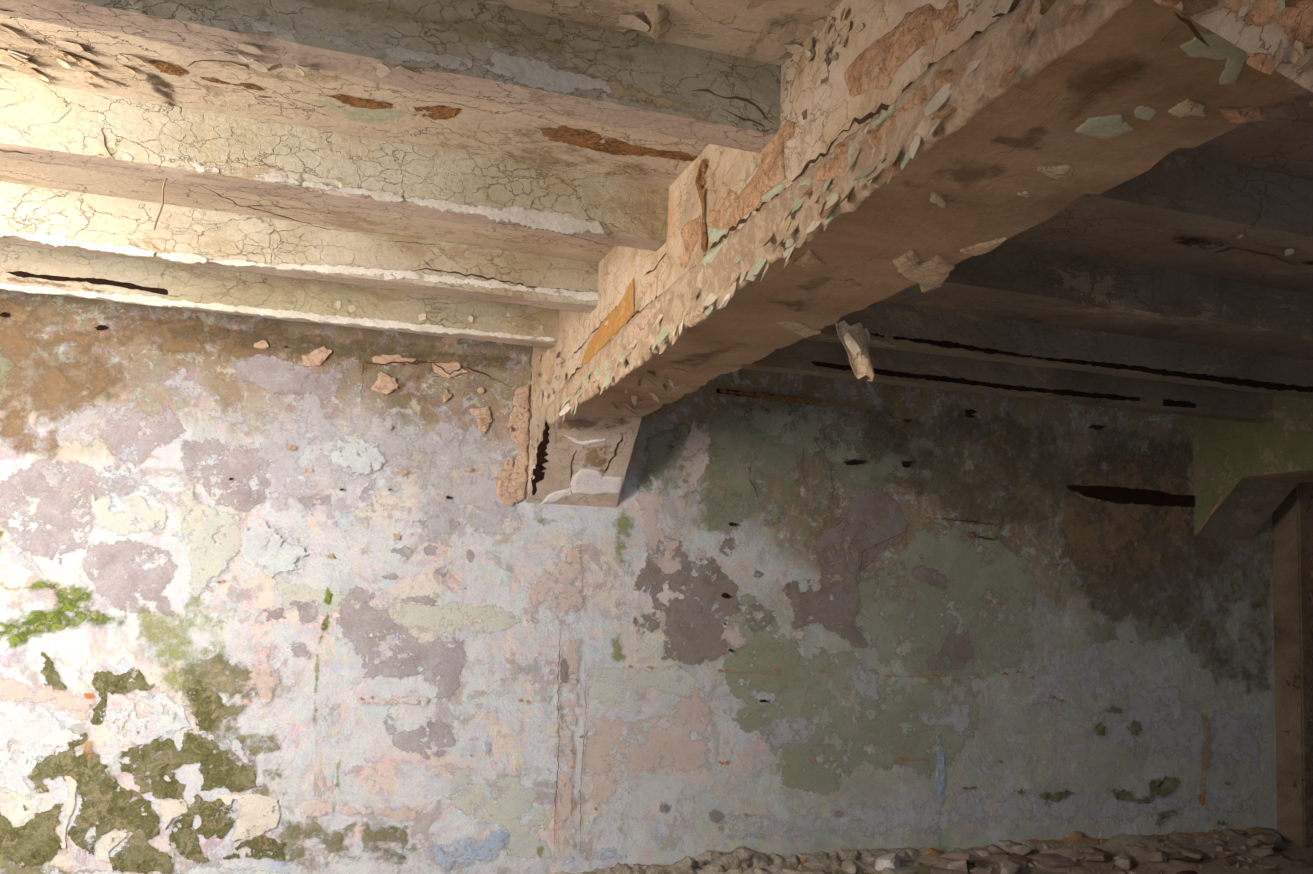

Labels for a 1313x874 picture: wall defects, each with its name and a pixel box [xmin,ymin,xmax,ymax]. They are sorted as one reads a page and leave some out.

crack [187,60,253,71]
crack [693,0,1020,257]
spalling [0,0,1140,479]
flaking render [0,406,271,617]
crack [360,346,577,498]
crack [603,432,623,475]
flaking render [633,420,908,668]
damp [642,399,1271,693]
peeling [40,652,67,691]
peeling [0,668,287,874]
damp [911,703,973,737]
damp [1029,643,1263,771]